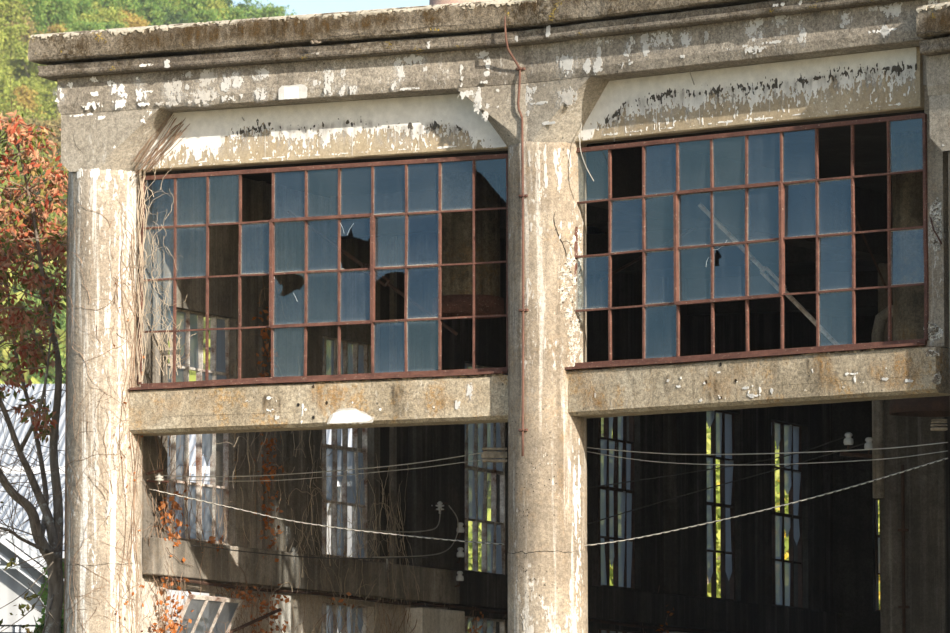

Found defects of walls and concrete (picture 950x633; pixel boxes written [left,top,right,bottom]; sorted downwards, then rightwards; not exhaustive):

peeling [70,37,506,170]
efflorescence [528,144,574,200]
peeling [526,38,613,116]
peeling [578,0,916,140]
water stain [77,168,138,387]
spalling [558,229,583,371]